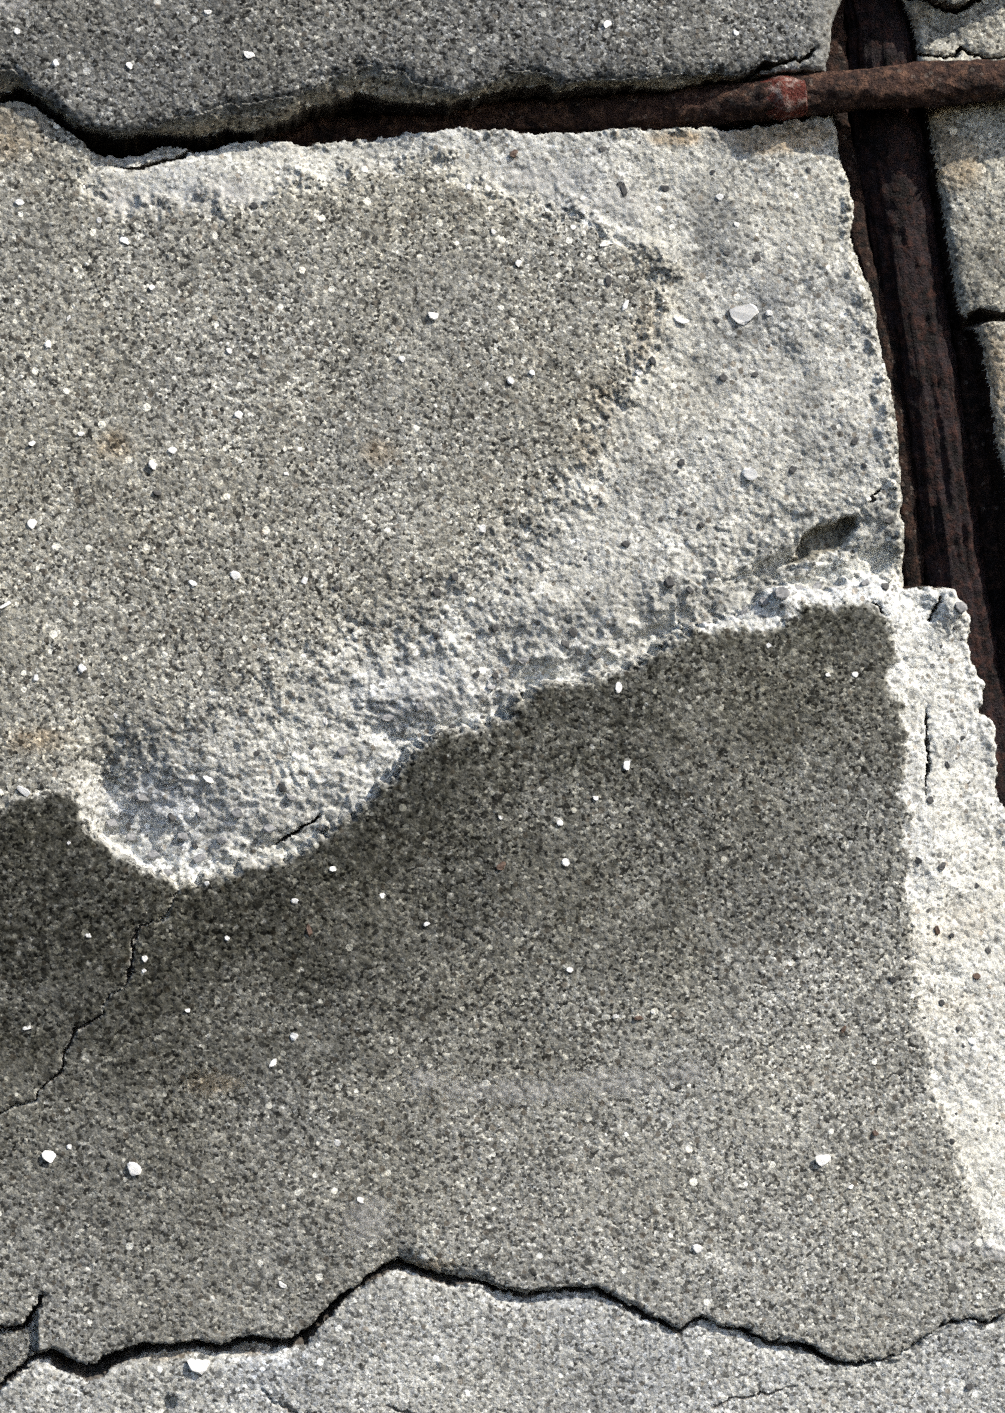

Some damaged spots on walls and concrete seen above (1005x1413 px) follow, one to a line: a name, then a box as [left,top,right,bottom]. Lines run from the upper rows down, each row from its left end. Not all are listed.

crack [0,48,830,170]
leakage [0,606,894,1064]
leakage [952,1238,1005,1259]
crack [0,1258,899,1390]
crack [938,1315,1001,1329]